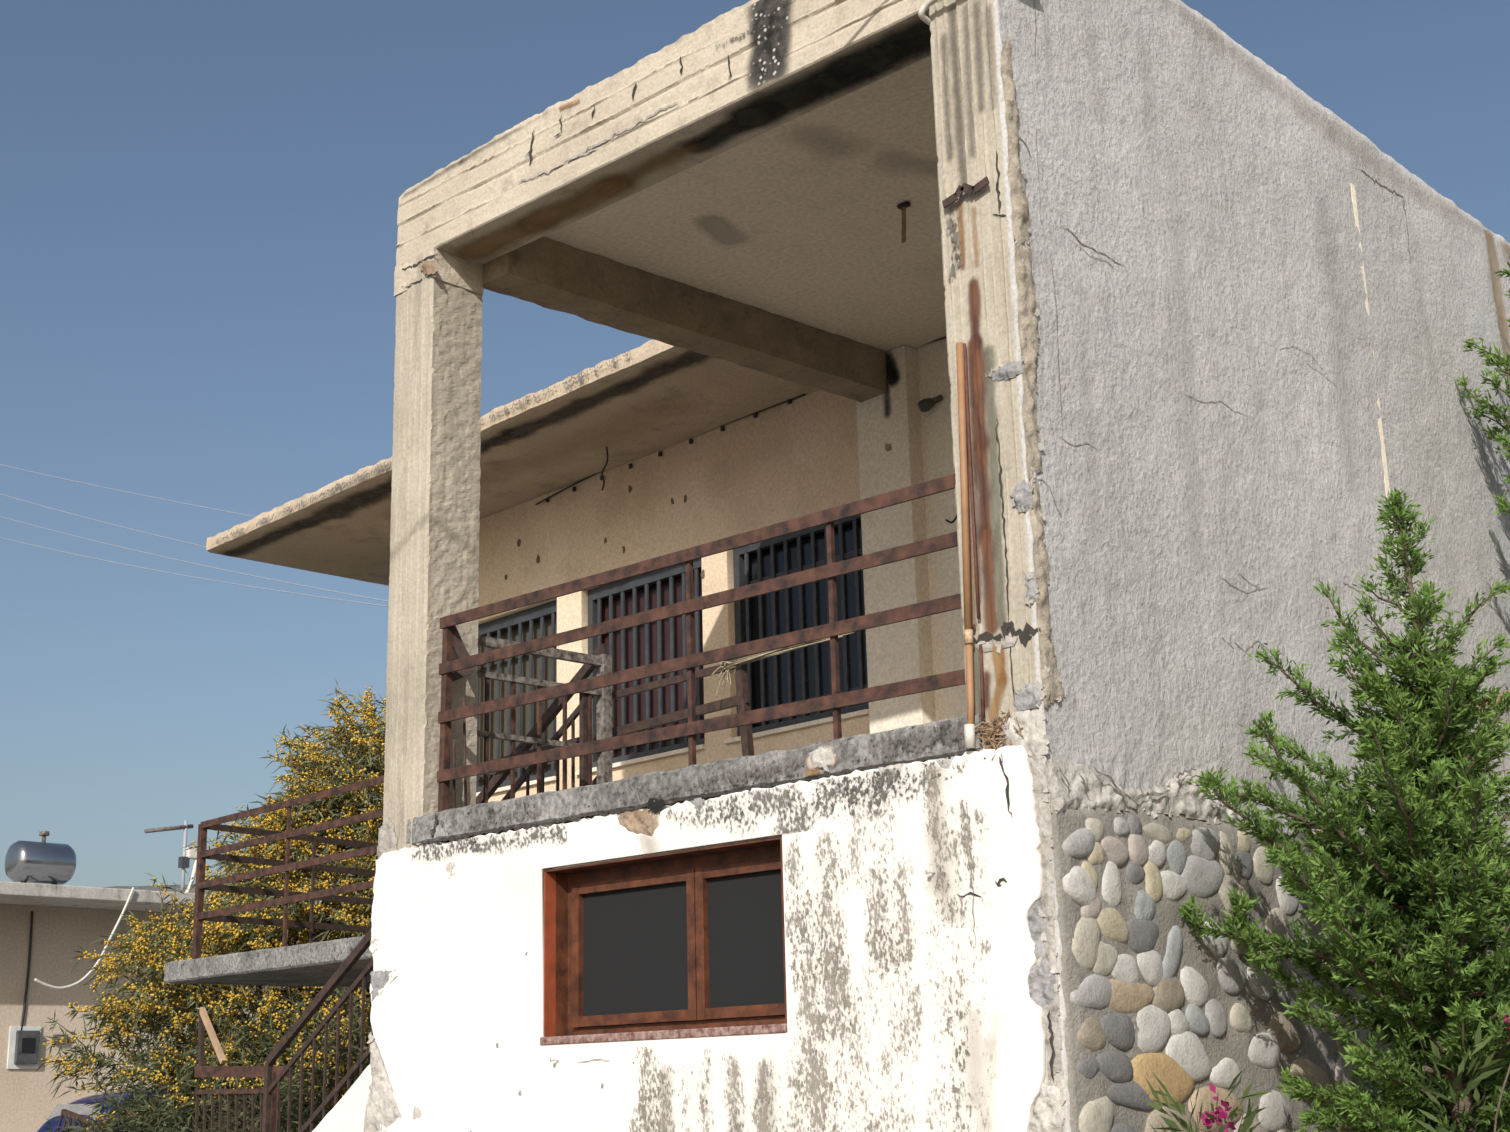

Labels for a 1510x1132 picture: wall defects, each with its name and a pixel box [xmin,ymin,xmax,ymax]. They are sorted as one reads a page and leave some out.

water stain [716,0,791,88]
water stain [457,146,693,258]
crack [1362,170,1411,263]
water stain [985,348,1004,626]
spalling [963,38,1247,1132]
spalling [615,795,665,837]
water stain [622,649,991,1132]
spalling [370,969,397,1001]
spalling [363,1032,421,1132]